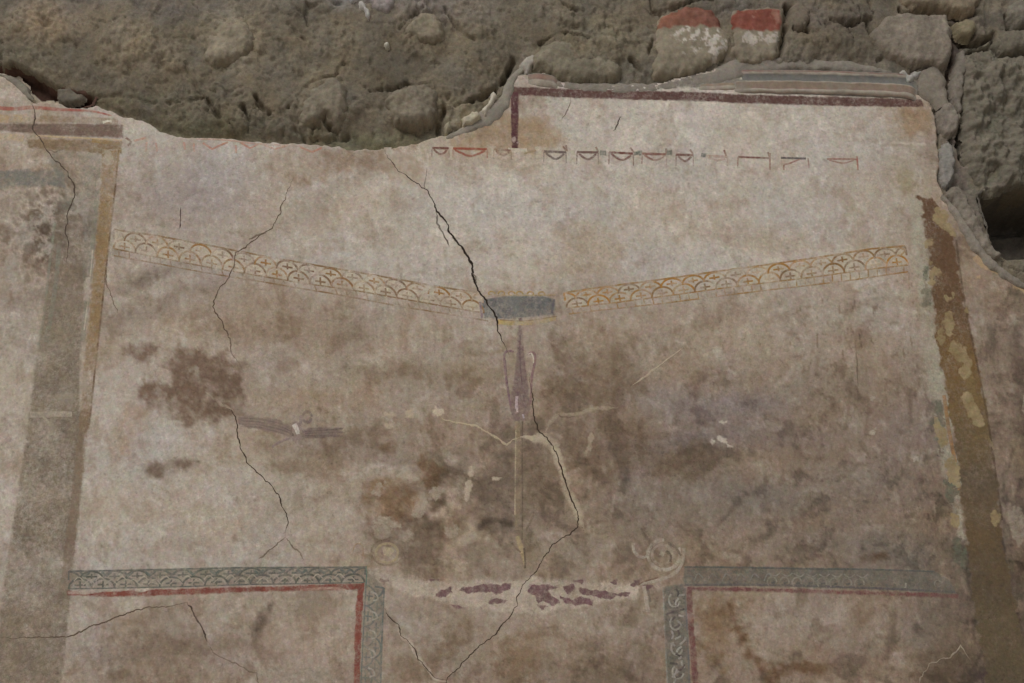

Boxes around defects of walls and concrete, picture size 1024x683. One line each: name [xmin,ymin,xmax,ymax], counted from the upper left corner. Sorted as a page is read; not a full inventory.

crack [30,98,76,262]
spalling [82,277,93,302]
water stain [102,332,366,496]
crack [205,181,304,560]
crack [387,157,509,354]
crack [385,379,617,683]
spalling [0,0,1024,296]
peeling [933,416,961,489]
peeling [935,291,985,428]
crack [6,602,259,683]